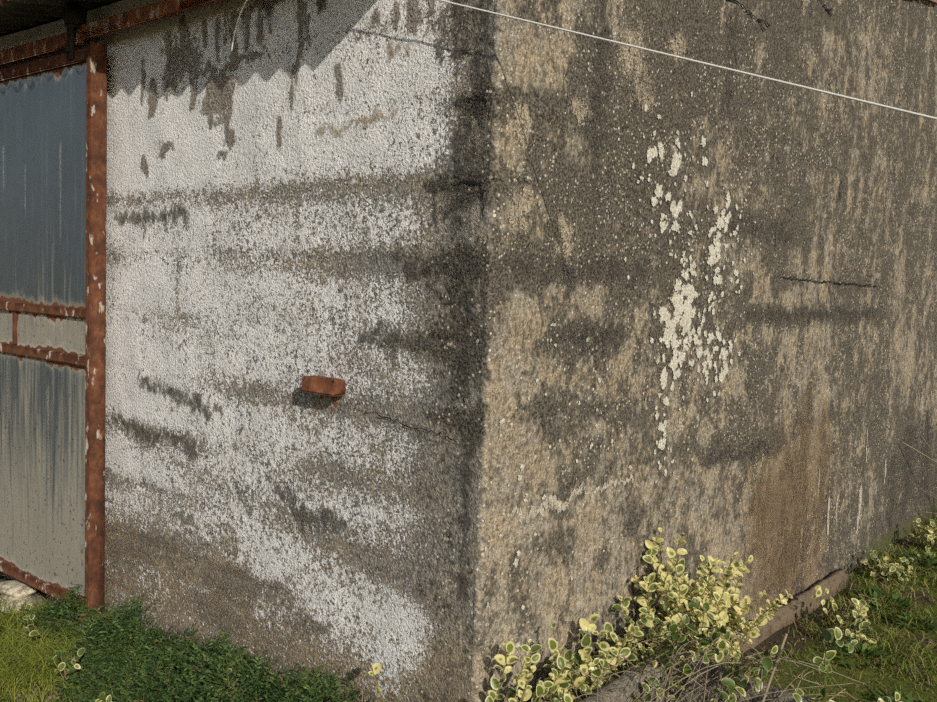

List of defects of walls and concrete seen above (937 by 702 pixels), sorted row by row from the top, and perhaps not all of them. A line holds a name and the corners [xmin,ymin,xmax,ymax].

damp [583,0,619,202]
flaking render [617,19,661,119]
flaking render [667,33,688,64]
crack [730,0,770,31]
damp [356,0,490,386]
peeling [632,130,754,483]
crack [774,275,881,310]
damp [115,410,201,461]
damp [137,371,224,421]
damp [274,480,348,534]
damp [455,410,475,607]
damp [702,388,839,610]